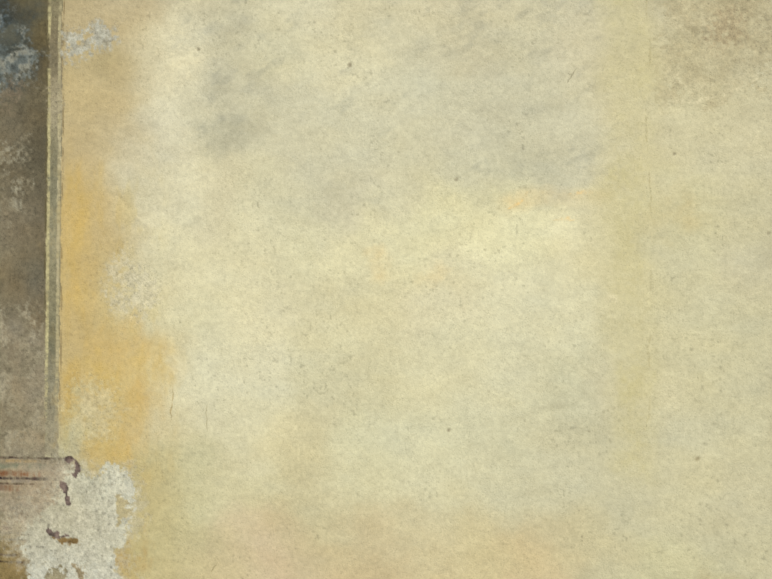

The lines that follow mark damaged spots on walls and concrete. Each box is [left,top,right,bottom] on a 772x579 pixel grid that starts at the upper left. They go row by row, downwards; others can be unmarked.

water stain [0,0,143,115]
peeling [0,366,154,579]